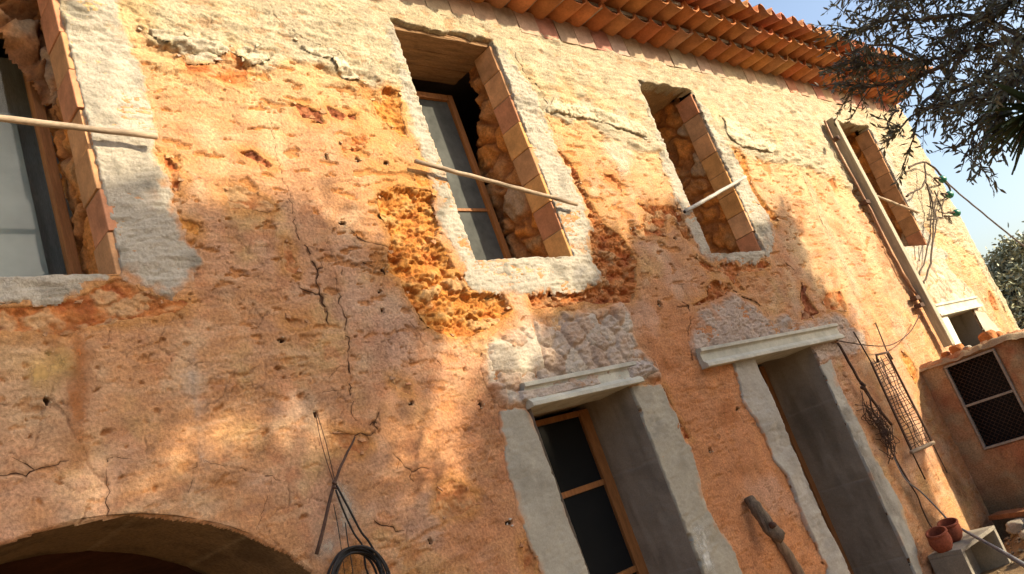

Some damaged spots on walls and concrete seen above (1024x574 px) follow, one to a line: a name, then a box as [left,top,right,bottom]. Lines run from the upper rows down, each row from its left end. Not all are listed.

crack [270,120,387,440]
spalling [377,175,514,339]
spalling [528,150,689,310]
crack [0,457,61,476]